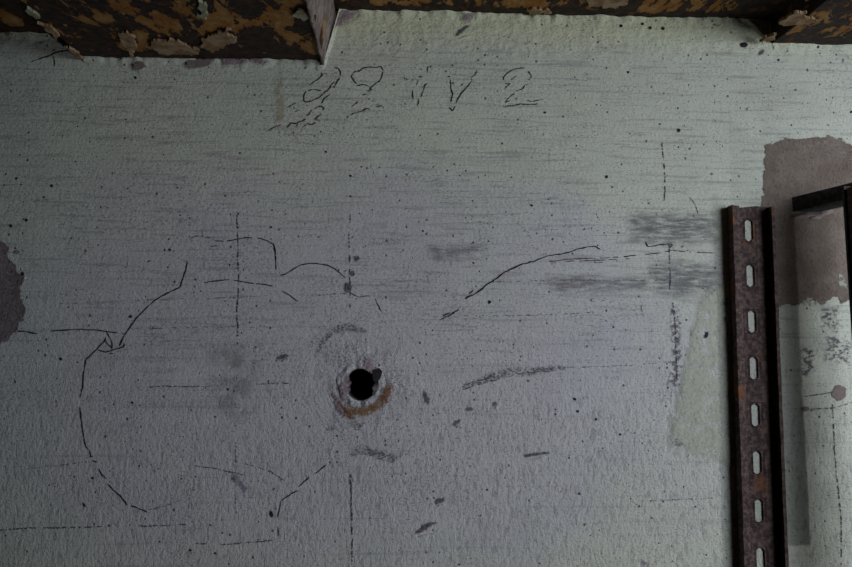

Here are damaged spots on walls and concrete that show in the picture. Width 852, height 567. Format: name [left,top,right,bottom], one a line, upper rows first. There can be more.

corrosion [335,383,393,419]